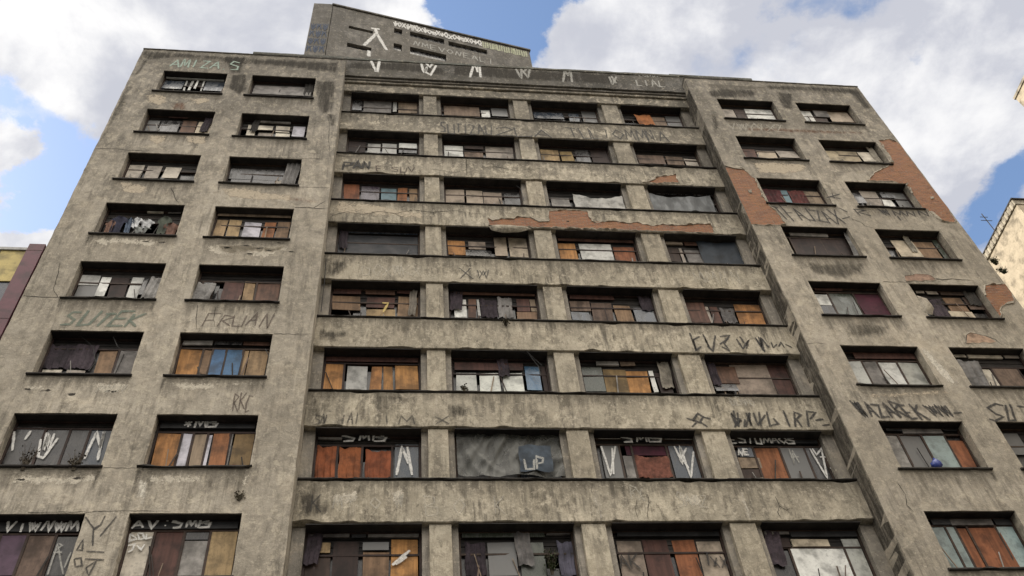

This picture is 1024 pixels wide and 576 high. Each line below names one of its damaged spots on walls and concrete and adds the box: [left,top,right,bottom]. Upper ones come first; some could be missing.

spalling [642,174,680,184]
spalling [725,162,805,226]
spalling [867,139,957,223]
spalling [486,209,715,234]
spalling [983,283,1015,317]